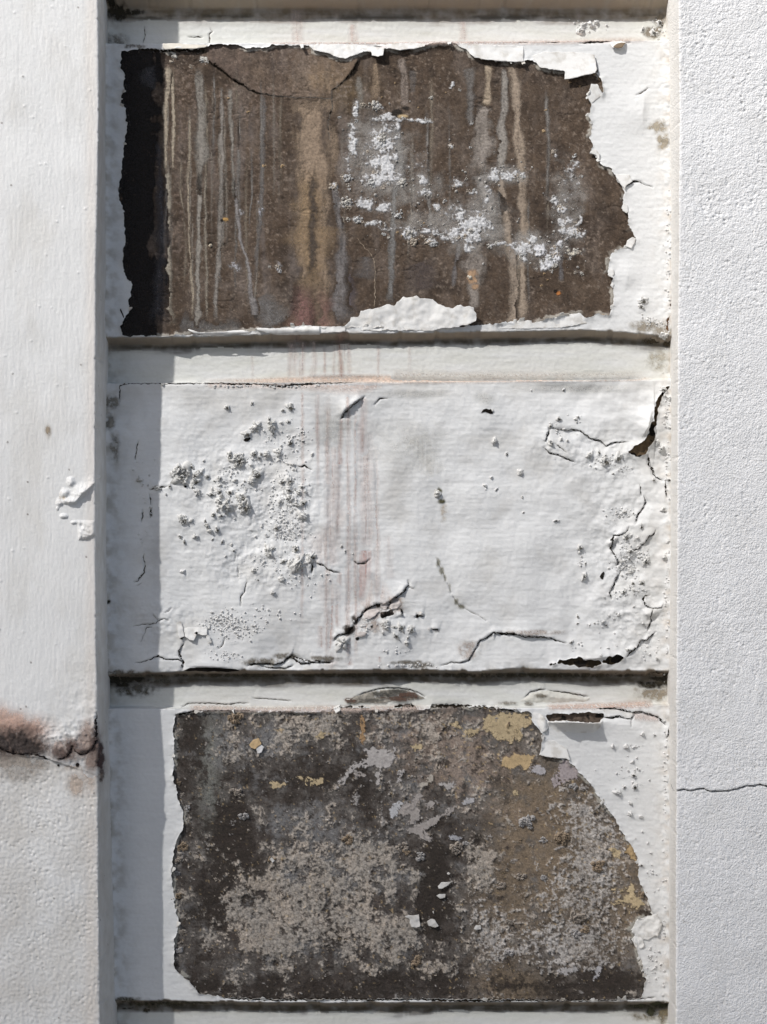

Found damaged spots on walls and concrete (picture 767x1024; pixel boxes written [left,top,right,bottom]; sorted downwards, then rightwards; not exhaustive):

crack [139,29,358,141]
water stain [114,36,586,337]
peeling [146,42,636,336]
crack [545,427,625,462]
crack [609,457,667,599]
crack [136,612,185,669]
crack [250,583,438,669]
crack [437,561,564,666]
crack [627,595,662,657]
crack [671,784,767,792]
peeling [171,689,662,1002]